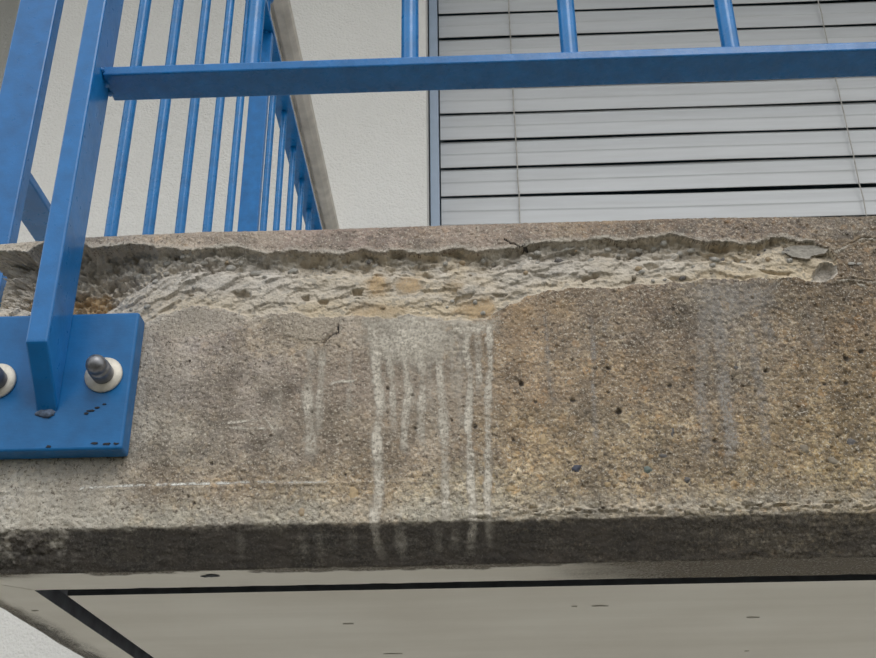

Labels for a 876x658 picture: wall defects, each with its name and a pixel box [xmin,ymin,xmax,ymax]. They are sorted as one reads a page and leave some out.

spalling [0,245,43,316]
spalling [74,235,838,322]
leakage [364,315,494,529]